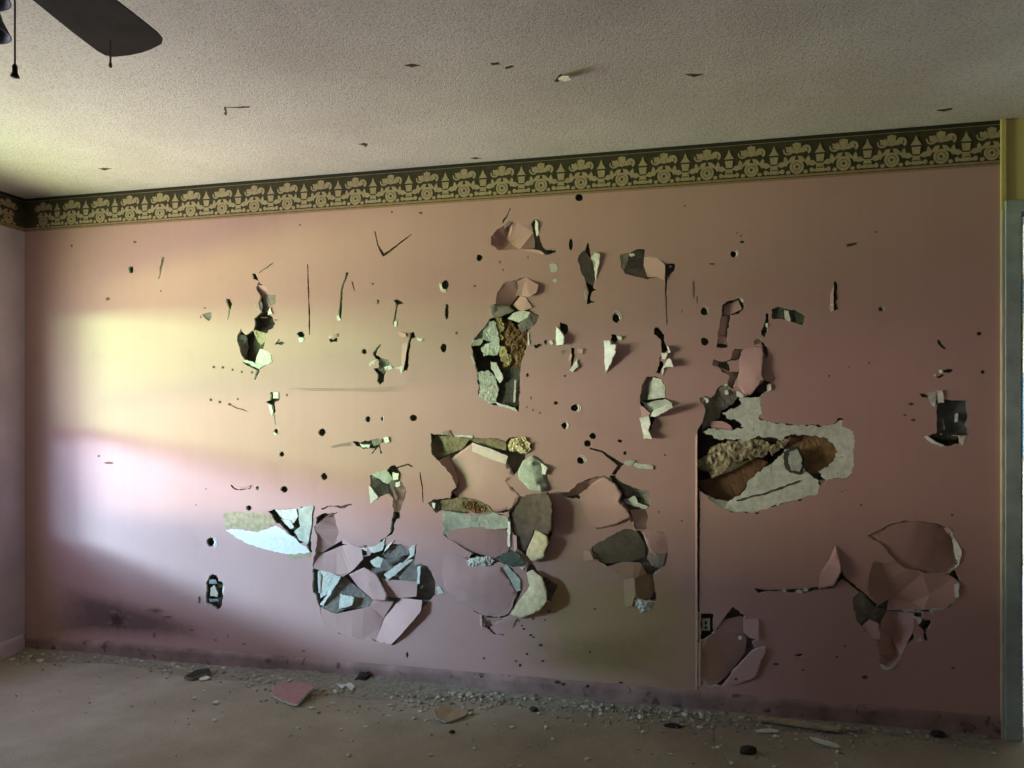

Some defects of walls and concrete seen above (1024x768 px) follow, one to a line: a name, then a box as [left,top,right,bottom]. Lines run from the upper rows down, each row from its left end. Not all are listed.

spalling [237,273,276,369]
crack [375,232,410,256]
spalling [471,277,539,412]
spalling [569,239,600,304]
spalling [620,249,675,280]
spalling [639,327,673,439]
spalling [697,298,855,515]
spalling [206,472,444,645]
spalling [428,430,532,592]
spalling [560,475,669,613]
crack [753,545,878,607]
spalling [697,607,779,687]